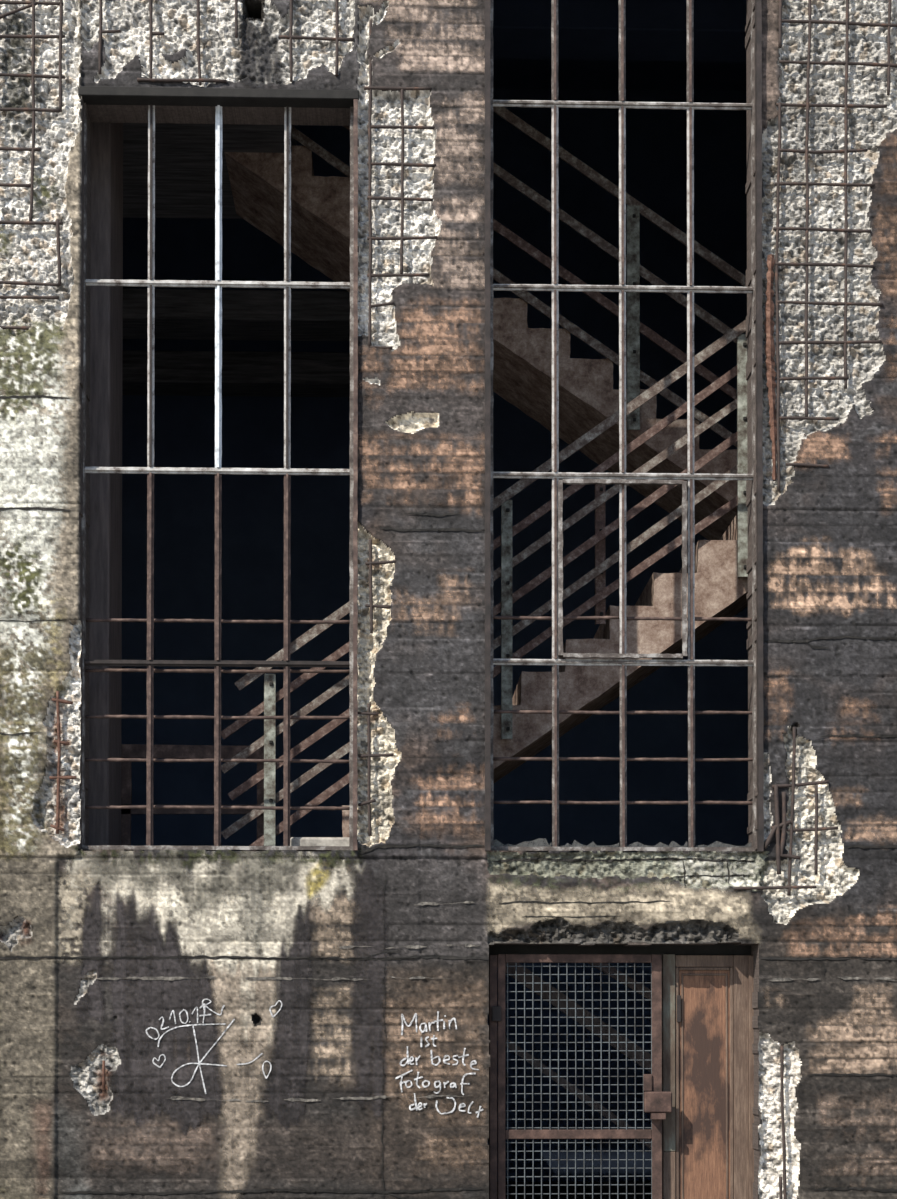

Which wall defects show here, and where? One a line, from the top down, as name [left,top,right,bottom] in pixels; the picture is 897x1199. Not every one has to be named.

spalling [0,0,485,388]
spalling [762,0,897,506]
damp [0,322,63,849]
spalling [357,521,468,847]
peeling [358,411,483,505]
peeling [418,770,482,831]
spalling [486,679,897,956]
spalling [70,1044,121,1116]
spalling [758,987,897,1199]